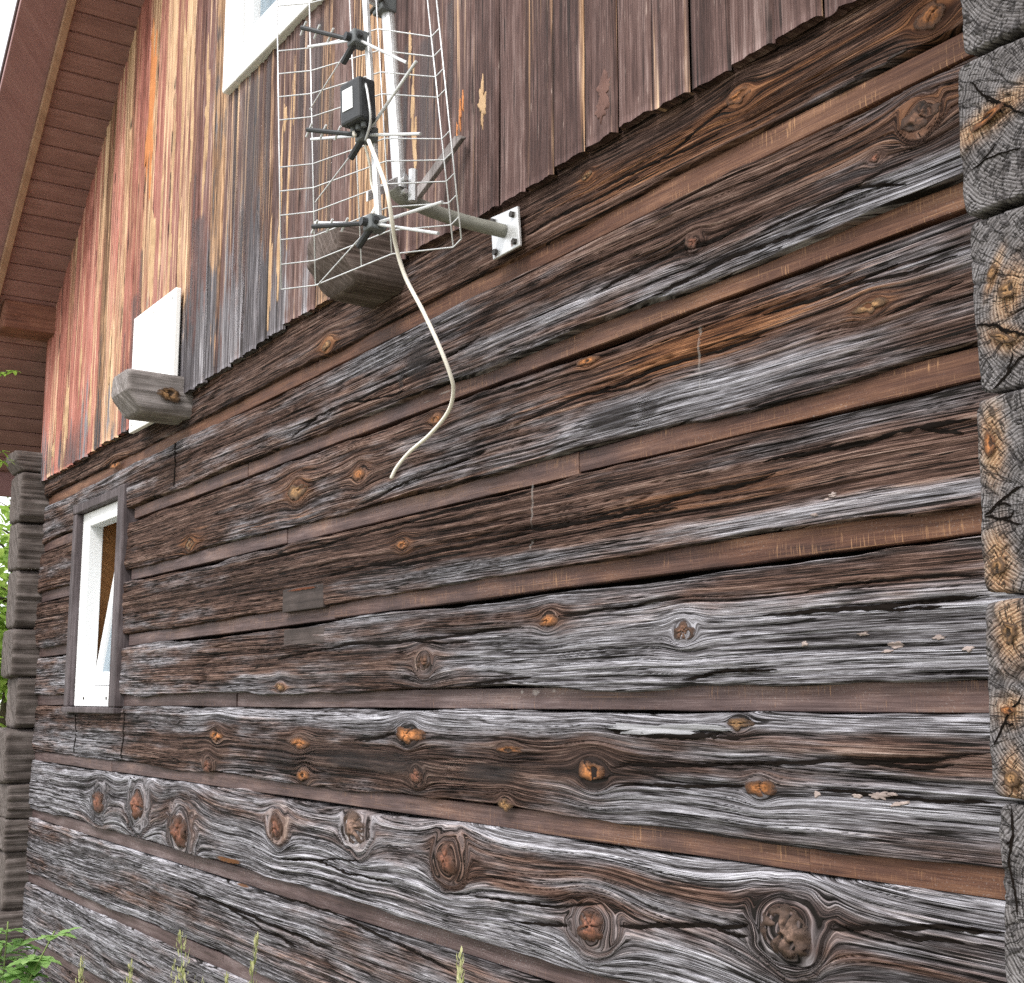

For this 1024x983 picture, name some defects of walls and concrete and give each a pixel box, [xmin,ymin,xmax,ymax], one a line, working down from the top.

crack [970,82,1024,114]
crack [971,144,1021,171]
crack [975,323,1024,389]
crack [984,486,1022,525]
crack [606,695,1022,788]